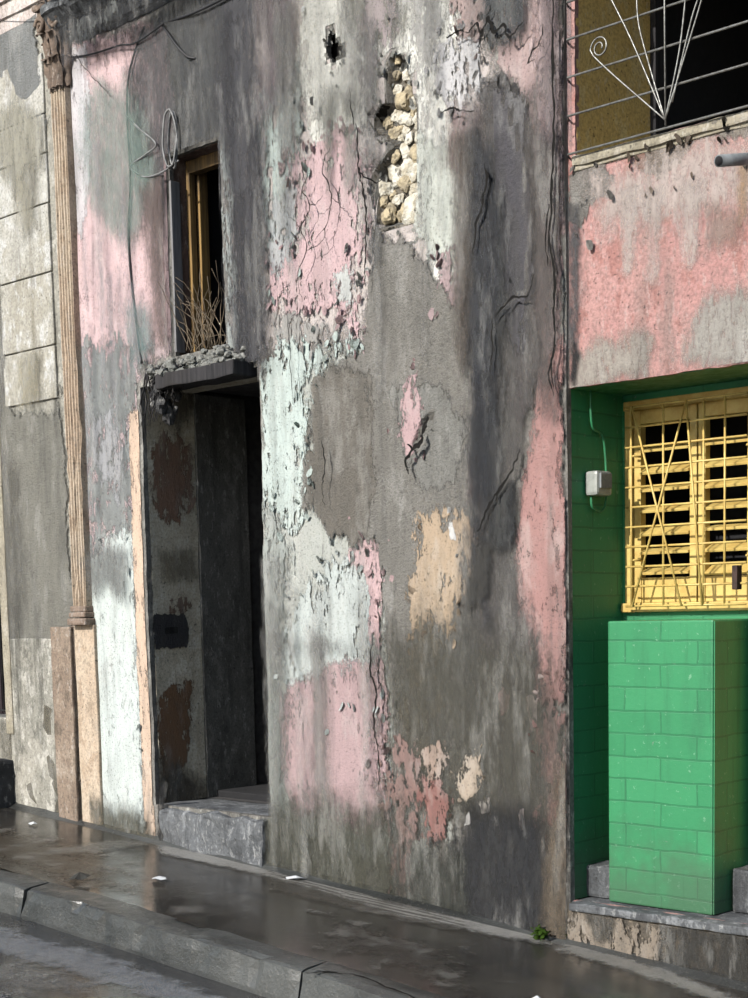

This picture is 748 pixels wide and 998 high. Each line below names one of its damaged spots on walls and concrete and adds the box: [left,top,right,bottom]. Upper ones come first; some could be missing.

crack [287,89,384,398]
crack [446,0,556,396]
corrosion [148,429,196,526]
flaking render [253,0,526,896]
crack [404,417,429,474]
water stain [264,0,580,940]
crack [477,448,520,532]
corrosion [156,678,195,779]